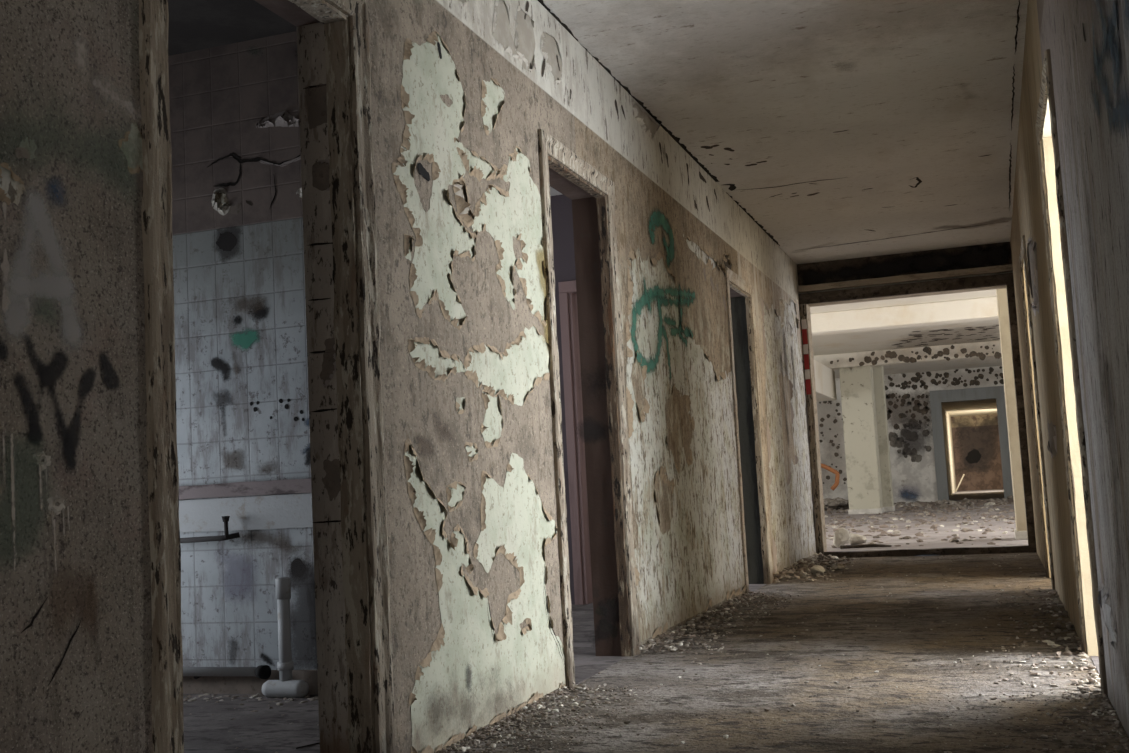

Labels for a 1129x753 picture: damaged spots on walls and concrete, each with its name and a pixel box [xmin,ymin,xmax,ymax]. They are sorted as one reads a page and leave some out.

crack [208,153,301,208]
peeling [392,31,570,753]
damp [830,325,1004,462]
peeling [1097,581,1118,652]